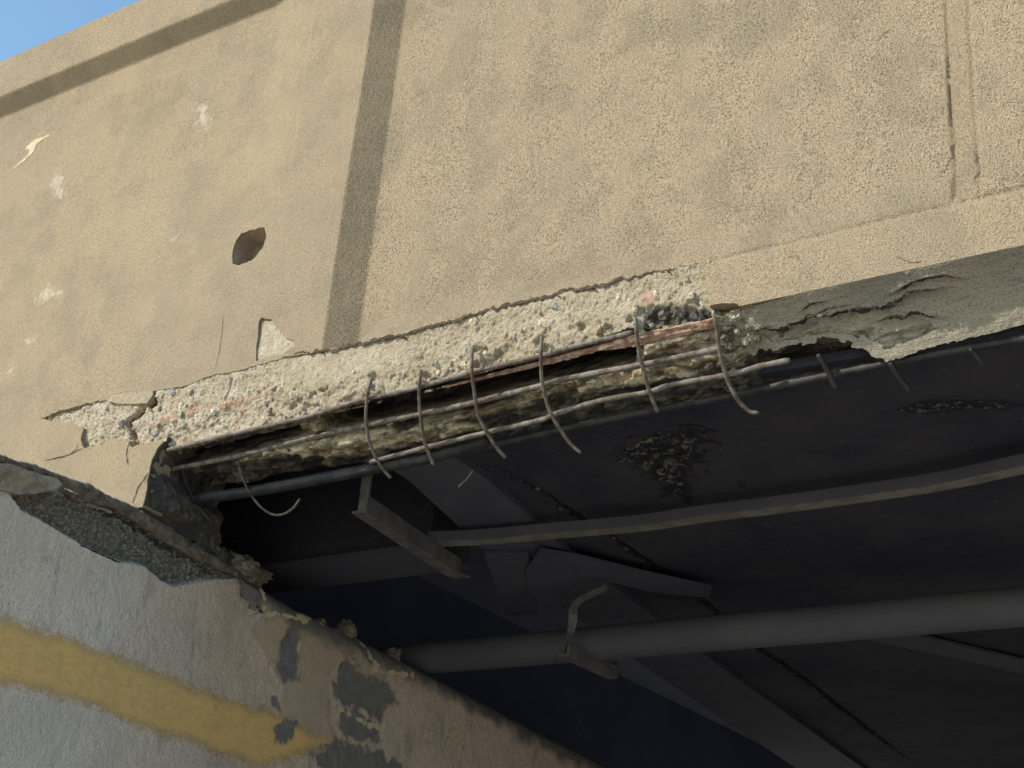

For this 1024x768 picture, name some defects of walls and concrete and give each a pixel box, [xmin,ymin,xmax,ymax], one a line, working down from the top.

crack [757,256,955,332]
spalling [47,259,1024,487]
corrosion [424,317,714,393]
spalling [619,424,718,502]
spalling [10,490,236,588]
peeling [246,588,414,679]